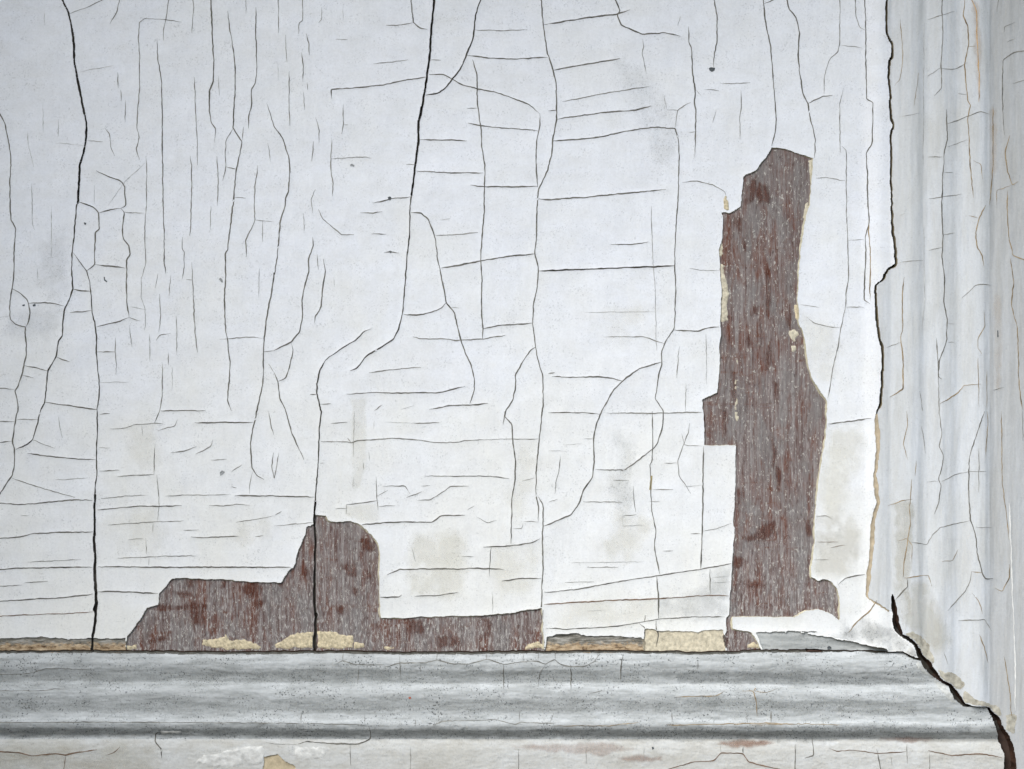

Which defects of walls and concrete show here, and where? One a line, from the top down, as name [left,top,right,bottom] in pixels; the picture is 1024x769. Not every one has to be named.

crack [278,0,320,156]
crack [763,0,777,146]
crack [0,114,16,265]
crack [117,0,205,434]
crack [194,0,314,497]
crack [314,257,326,323]
crack [303,192,354,235]
crack [330,0,731,637]
crack [106,449,159,496]
peeling [0,148,889,654]
crack [0,559,86,570]
crack [928,416,1017,769]